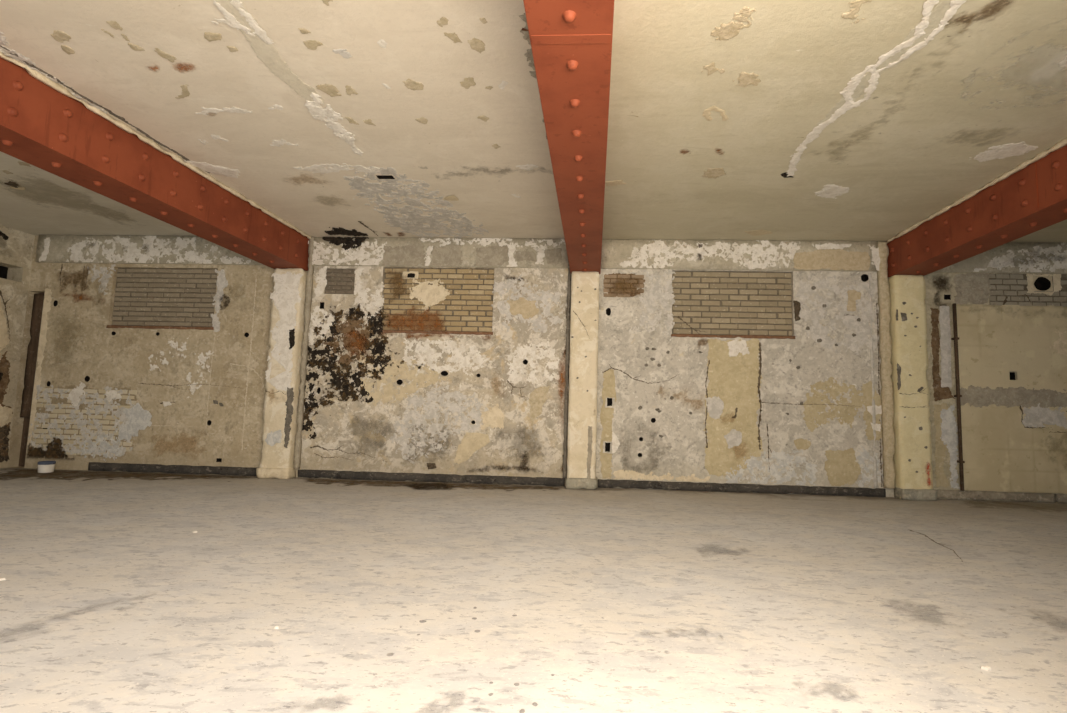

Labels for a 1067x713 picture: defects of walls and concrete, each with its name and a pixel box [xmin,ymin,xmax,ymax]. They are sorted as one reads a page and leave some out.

peeling [437,17,485,54]
peeling [460,77,493,90]
spalling [519,13,537,79]
crack [787,0,966,176]
peeling [39,237,51,262]
peeling [66,235,251,332]
peeling [148,331,214,398]
peeling [265,227,387,448]
mould [302,304,404,439]
peeling [293,163,852,469]
peeling [587,338,884,487]
spalling [896,294,1067,489]